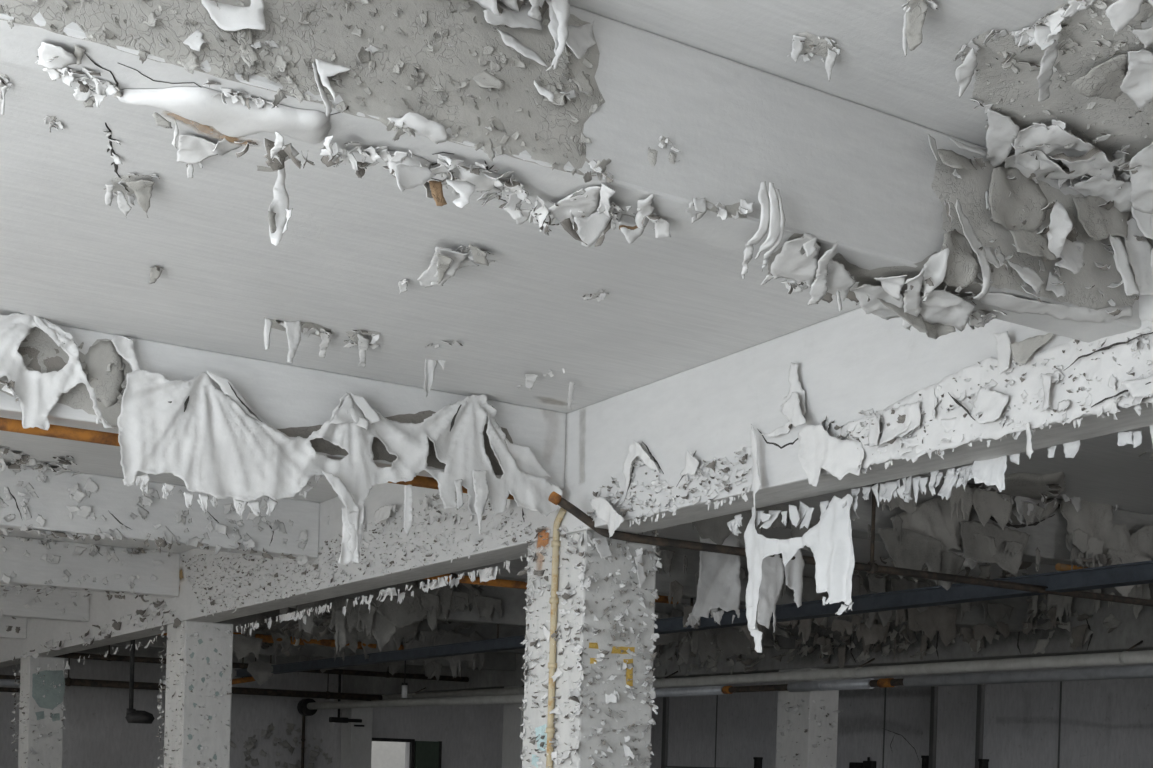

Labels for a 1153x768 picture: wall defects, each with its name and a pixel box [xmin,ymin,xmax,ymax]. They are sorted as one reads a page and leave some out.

peeling [149,265,164,284]
peeling [0,0,671,248]
peeling [398,244,495,293]
peeling [647,136,681,167]
peeling [685,0,1153,339]
peeling [0,313,1153,768]